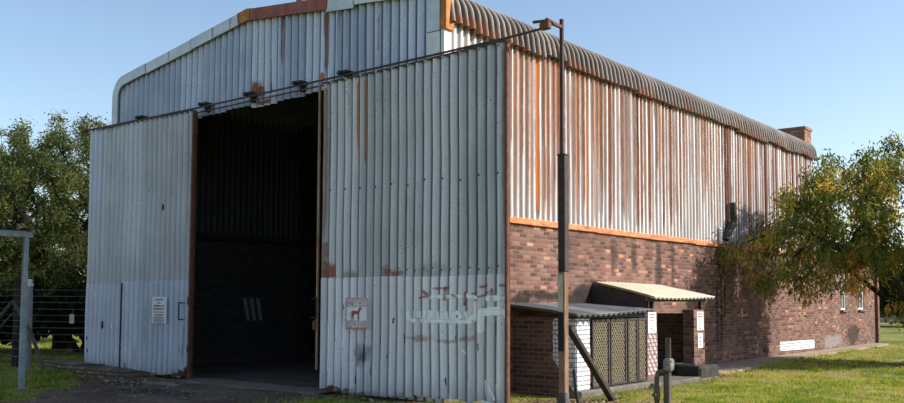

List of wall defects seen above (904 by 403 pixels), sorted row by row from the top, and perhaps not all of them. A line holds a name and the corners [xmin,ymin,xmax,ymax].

rust [320,12,336,277]
rust [357,79,367,171]
rust [502,45,807,240]